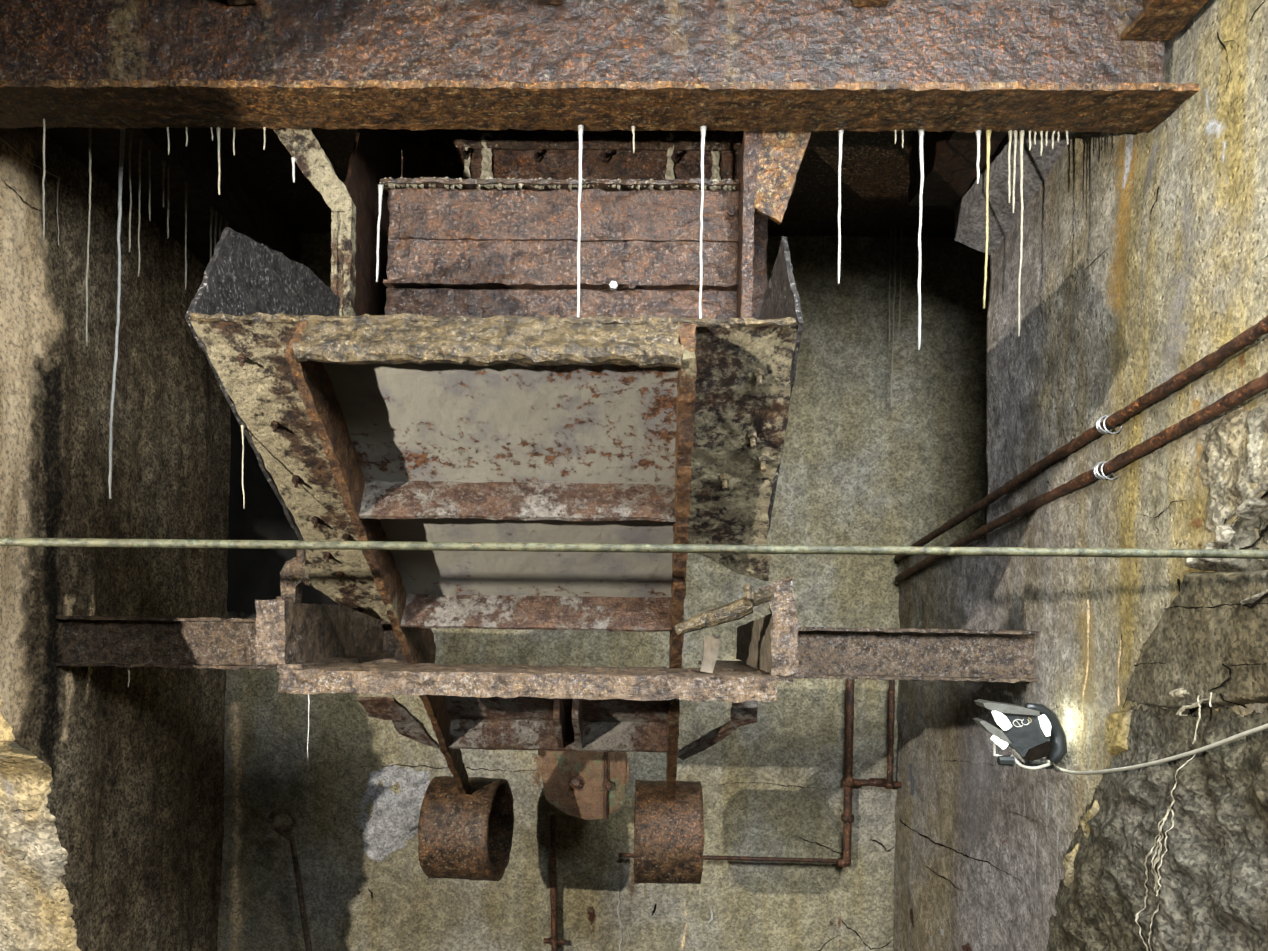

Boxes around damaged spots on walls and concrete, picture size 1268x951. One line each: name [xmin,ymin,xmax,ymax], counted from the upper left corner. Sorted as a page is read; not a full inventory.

efflorescence [463,133,494,180]
efflorescence [665,133,675,180]
leakage [710,151,721,180]
crack [1165,579,1268,609]
crack [1118,633,1165,708]
crack [1208,662,1268,708]